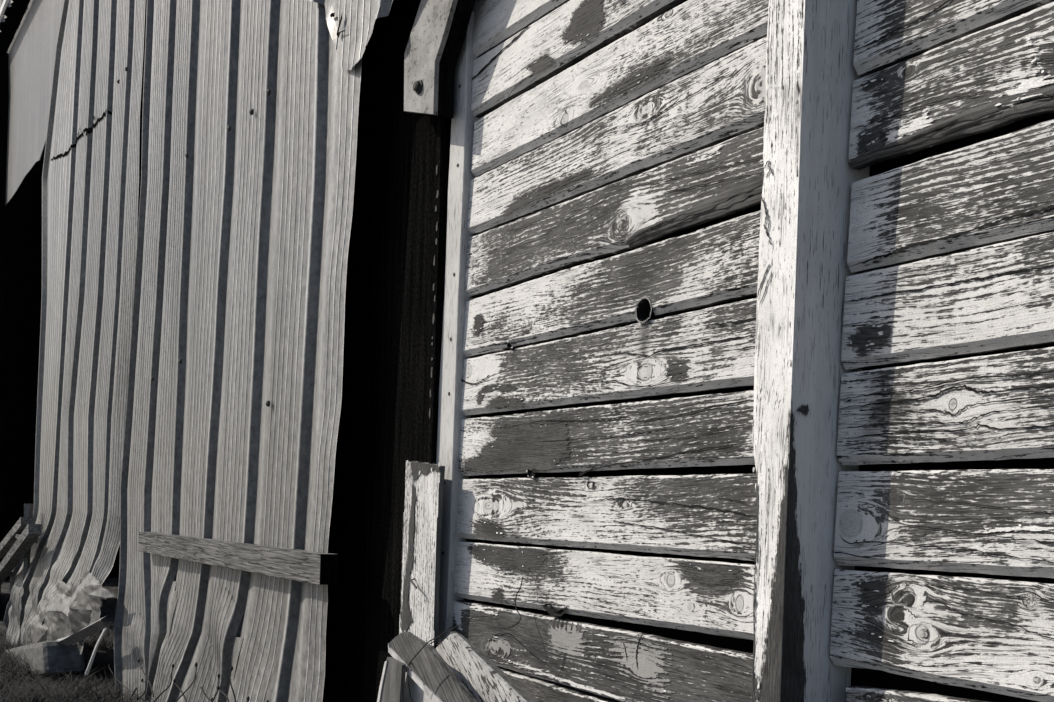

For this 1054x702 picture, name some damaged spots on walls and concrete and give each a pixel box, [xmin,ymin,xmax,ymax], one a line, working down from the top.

peeling [561,0,606,47]
spalling [848,35,1054,169]
peeling [685,144,725,169]
spalling [626,161,773,248]
peeling [473,313,485,336]
peeling [476,383,525,409]
peeling [463,418,572,478]
peeling [466,516,549,577]
peeling [677,408,806,702]
peeling [976,520,1054,537]
peeling [541,604,591,665]
peeling [482,632,676,702]